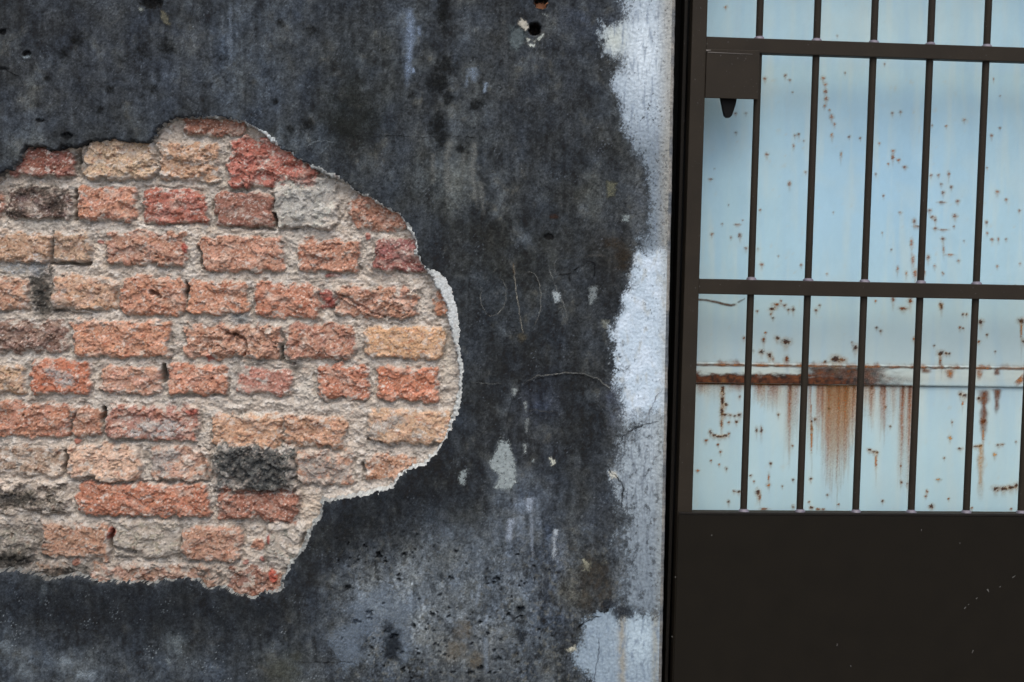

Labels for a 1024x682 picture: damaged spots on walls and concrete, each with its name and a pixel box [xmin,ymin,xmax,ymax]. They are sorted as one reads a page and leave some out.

water stain [406,12,420,76]
water stain [428,56,487,207]
flaking render [0,115,464,599]
crack [522,372,611,390]
rust [696,332,1024,480]
water stain [329,591,409,668]
water stain [603,600,631,618]